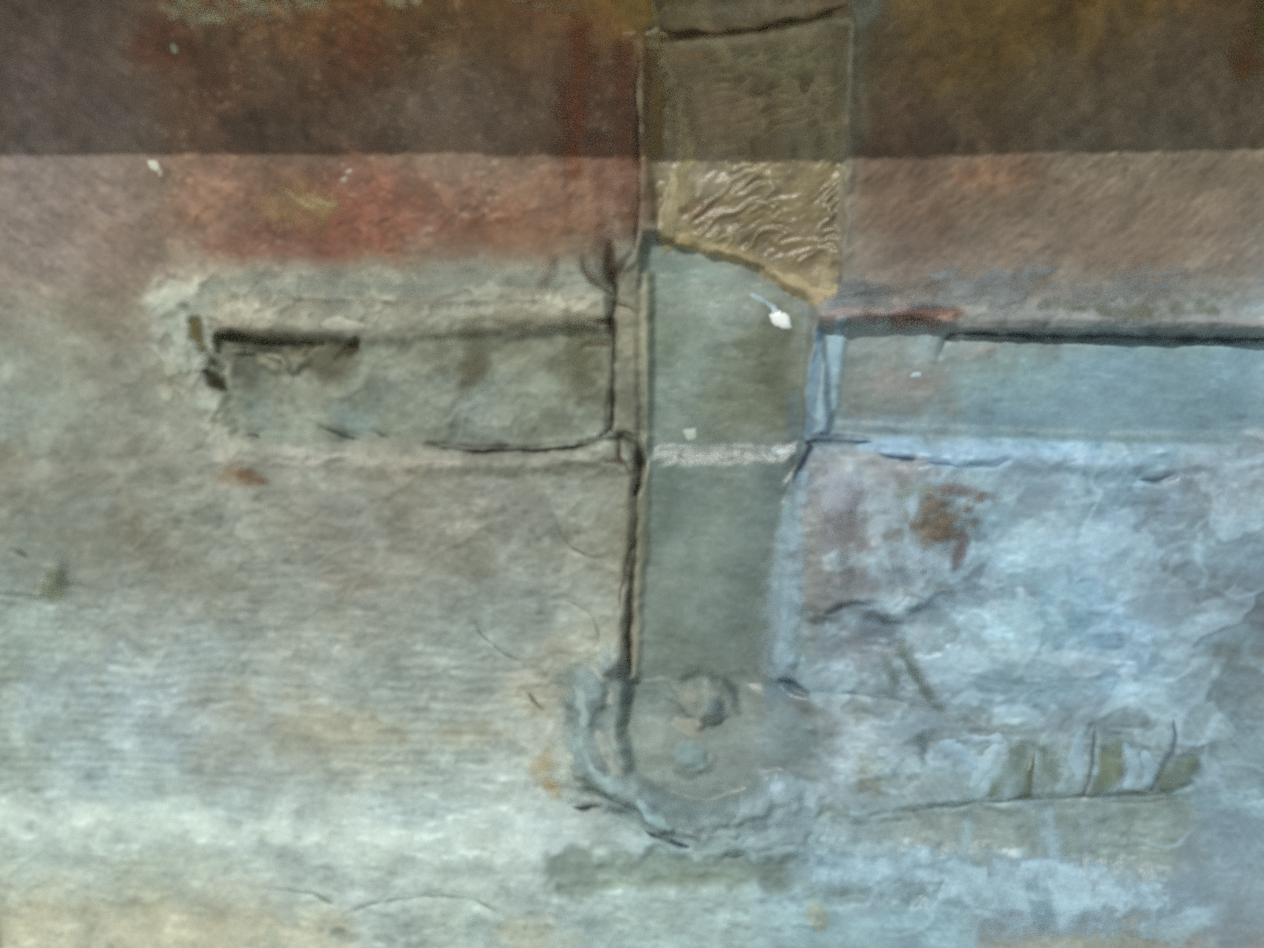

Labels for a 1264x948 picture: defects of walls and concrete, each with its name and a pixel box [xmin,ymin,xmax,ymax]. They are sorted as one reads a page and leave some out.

spalling [188,317,274,390]
crack [432,77,644,668]
corrosion [902,486,983,565]